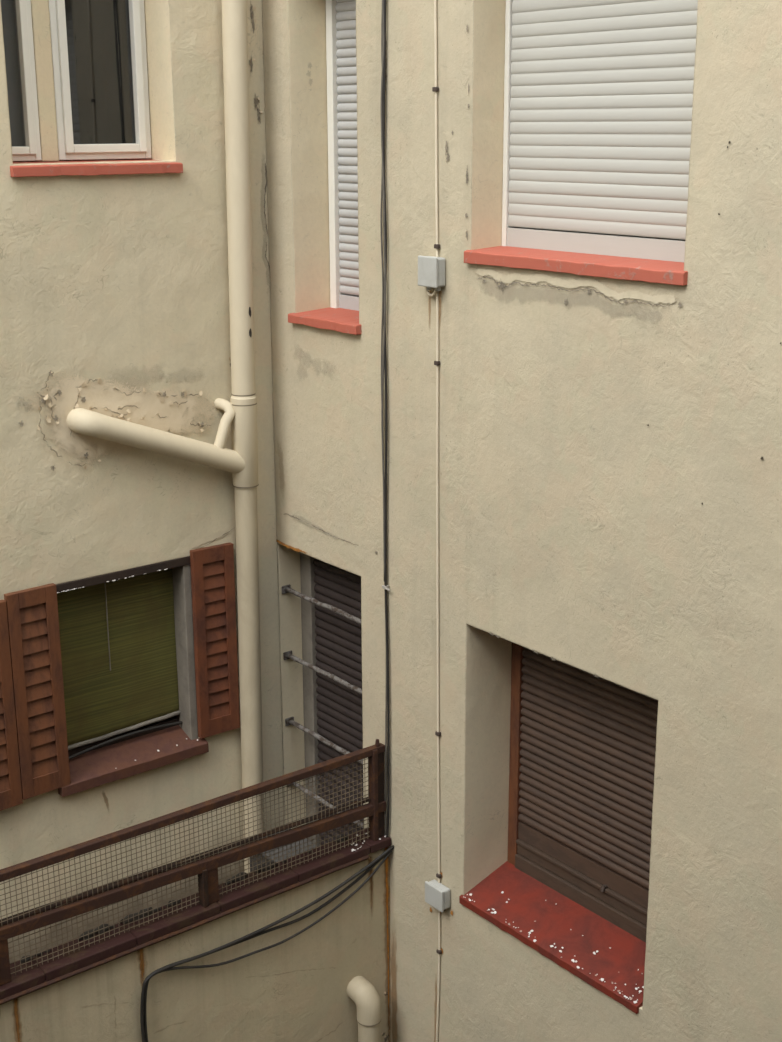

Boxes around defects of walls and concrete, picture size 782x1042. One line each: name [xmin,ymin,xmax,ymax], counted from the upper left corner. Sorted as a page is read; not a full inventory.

peeling [18,369,220,473]